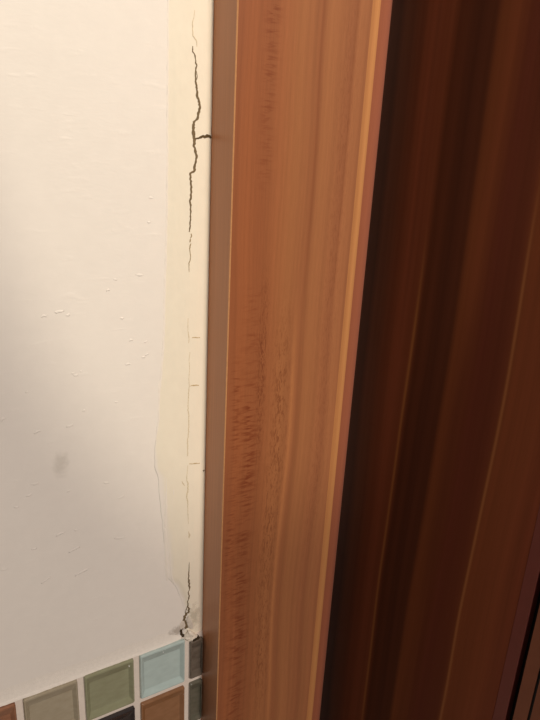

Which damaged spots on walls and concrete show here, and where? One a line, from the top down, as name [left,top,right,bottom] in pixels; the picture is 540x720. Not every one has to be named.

crack [188,11,212,264]
crack [182,332,200,538]
crack [182,563,190,629]